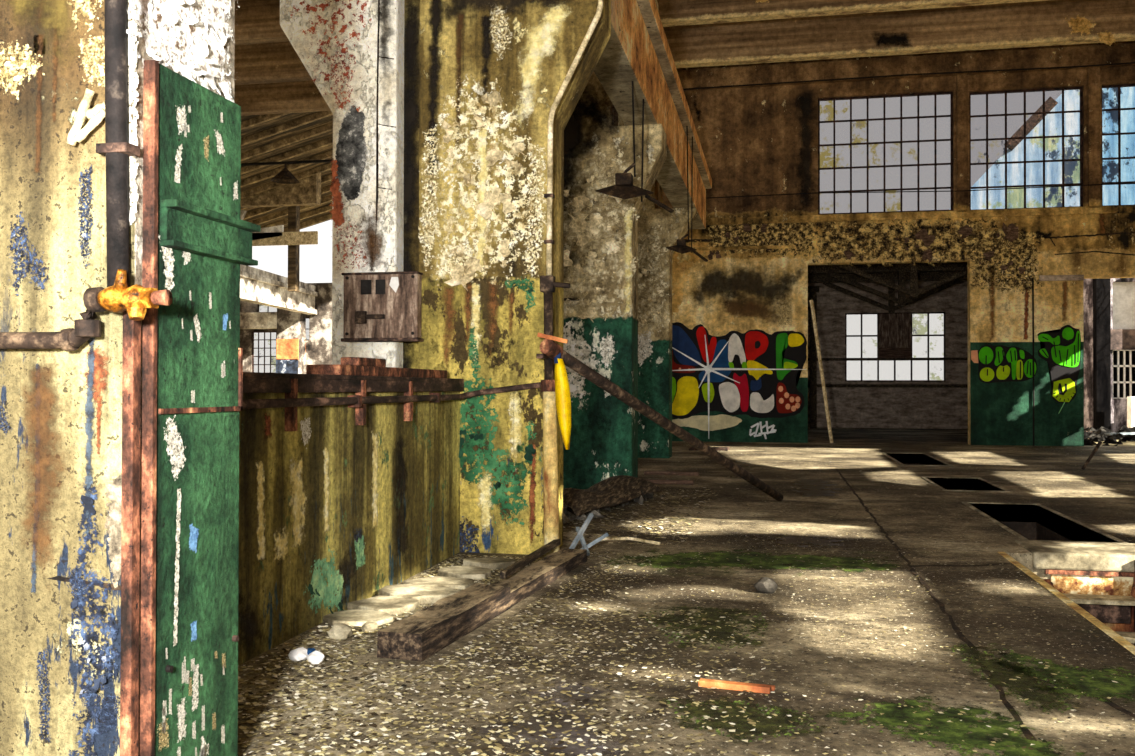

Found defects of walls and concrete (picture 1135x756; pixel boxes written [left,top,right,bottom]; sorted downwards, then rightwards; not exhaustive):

rust [85,349,108,454]
peeling [163,415,199,659]
peeling [126,0,240,226]
peeling [157,656,225,756]
leakage [403,342,412,368]
leakage [377,0,568,272]
peeling [418,76,547,312]
peeling [458,327,542,553]
peeling [489,6,512,60]
leakage [694,268,801,322]
peeling [563,138,1044,399]
crack [836,469,1135,755]